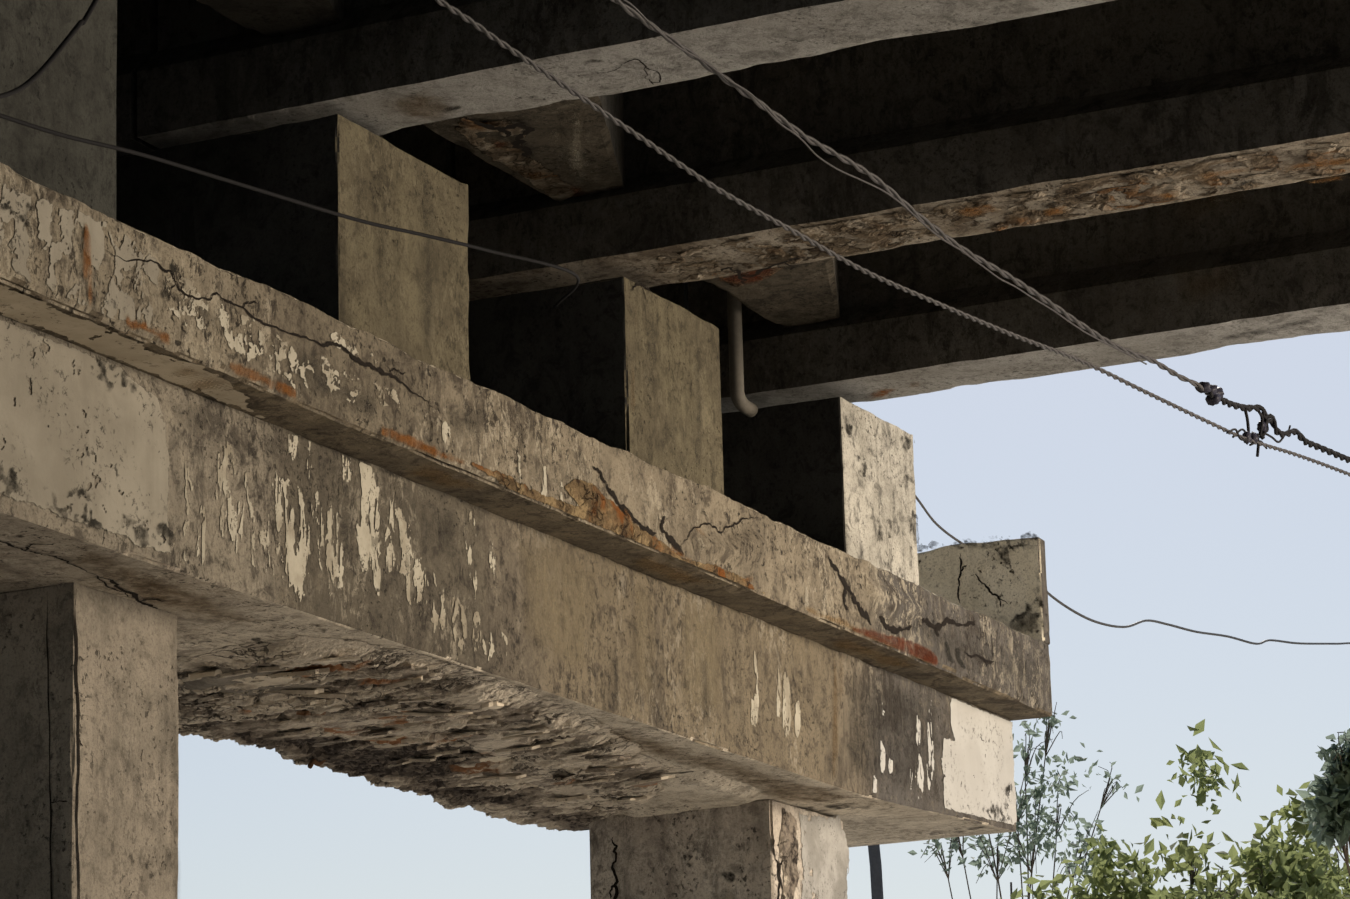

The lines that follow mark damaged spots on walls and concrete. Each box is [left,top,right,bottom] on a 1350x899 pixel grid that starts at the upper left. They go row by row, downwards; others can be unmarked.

spalling [455,117,578,201]
crack [108,251,433,441]
spalling [0,183,675,831]
spalling [471,454,765,594]
crack [593,466,757,556]
crack [0,541,169,899]
peeling [751,650,759,727]
peeling [776,668,801,738]
corrosion [853,628,938,664]
crack [829,554,1009,666]
crack [609,837,619,899]
crack [771,818,783,899]